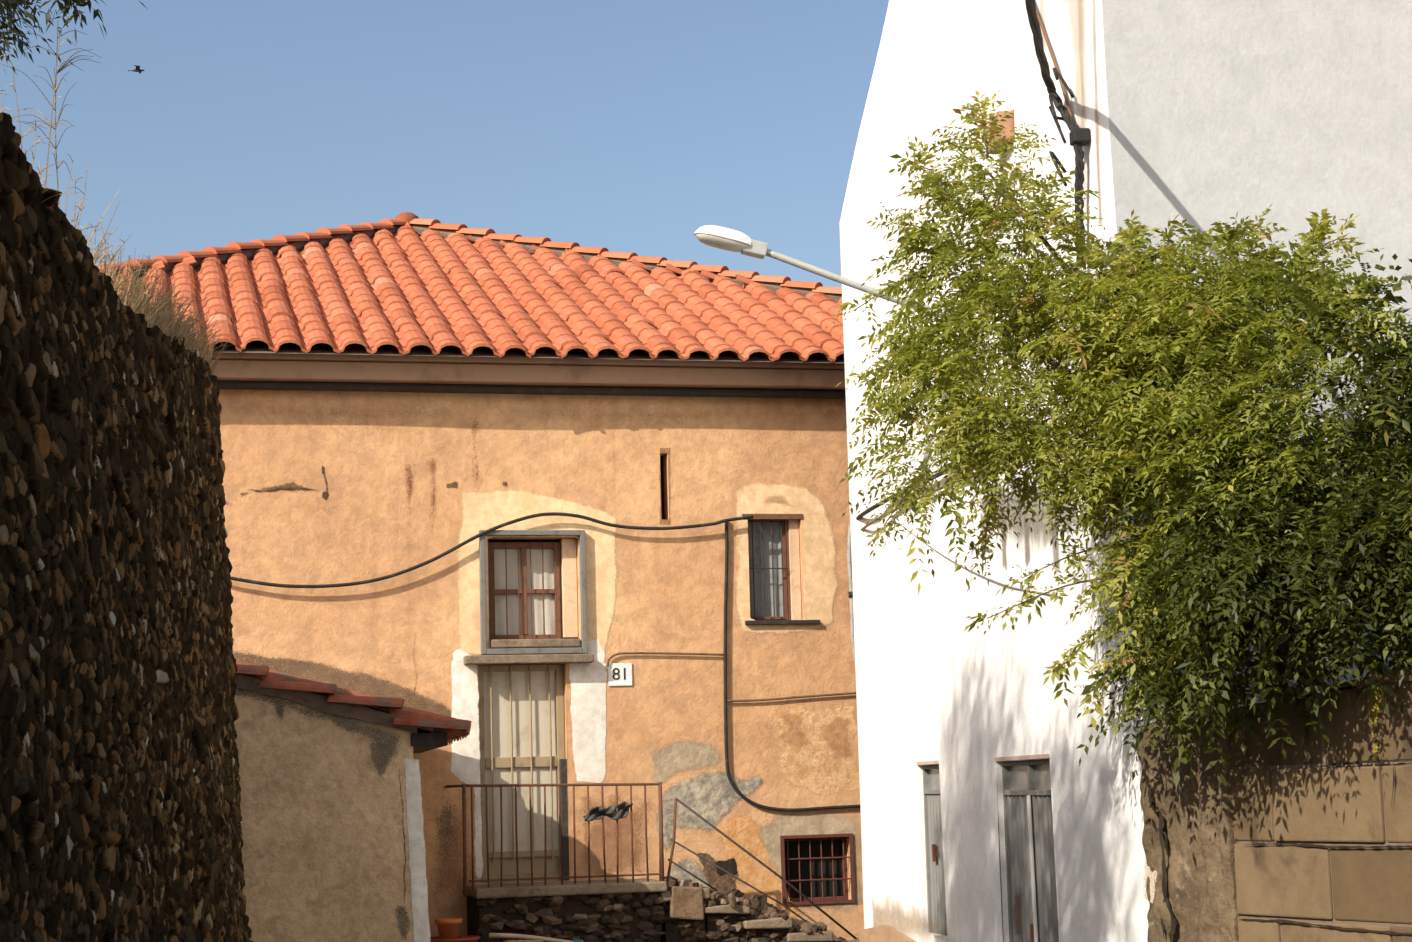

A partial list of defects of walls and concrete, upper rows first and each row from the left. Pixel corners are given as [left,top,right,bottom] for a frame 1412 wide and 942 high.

water stain [235,687,401,775]
crack [1143,777,1177,942]